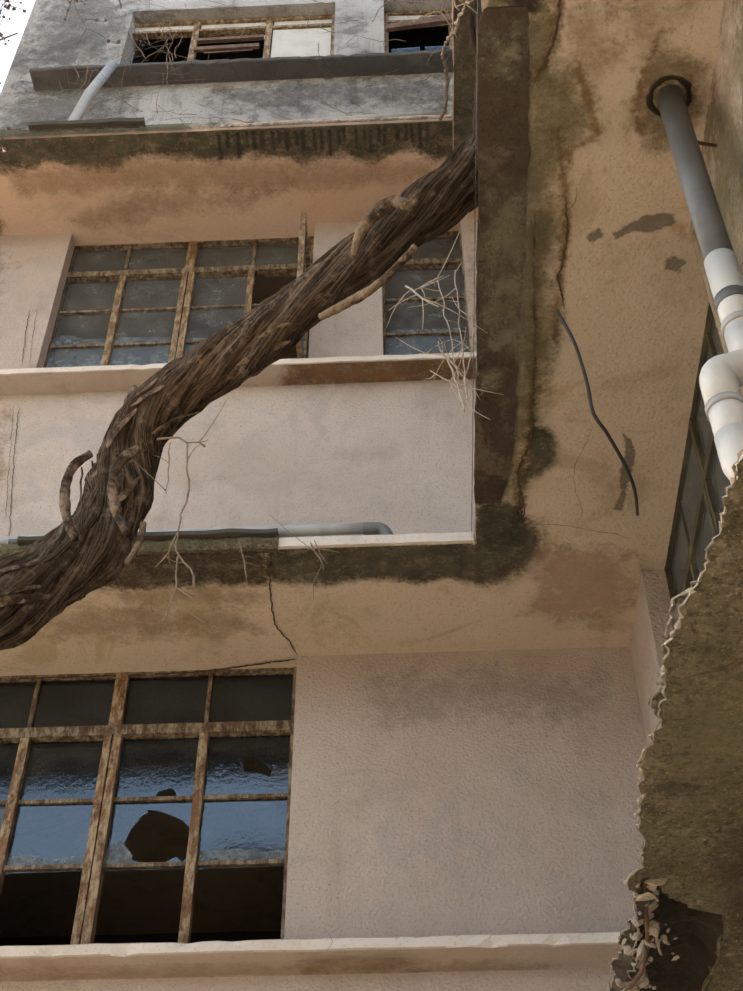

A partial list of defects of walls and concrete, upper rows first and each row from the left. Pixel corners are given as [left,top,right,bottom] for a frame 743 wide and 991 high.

crack [532,0,561,87]
damp [631,0,743,275]
damp [0,0,478,532]
damp [691,220,728,354]
crack [0,554,298,679]
damp [104,551,269,590]
spalling [607,449,743,991]